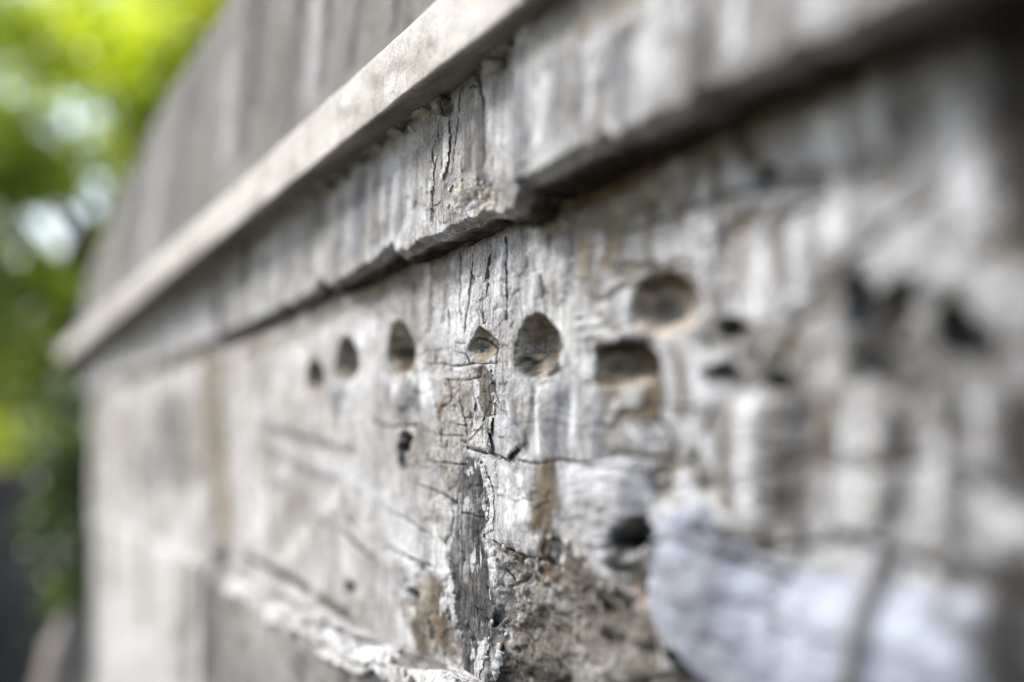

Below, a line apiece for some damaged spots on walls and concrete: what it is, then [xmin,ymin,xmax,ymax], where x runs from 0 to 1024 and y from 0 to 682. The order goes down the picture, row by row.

crack [430,79,485,223]
crack [373,236,716,493]
crack [416,484,571,586]
spalling [401,366,702,682]